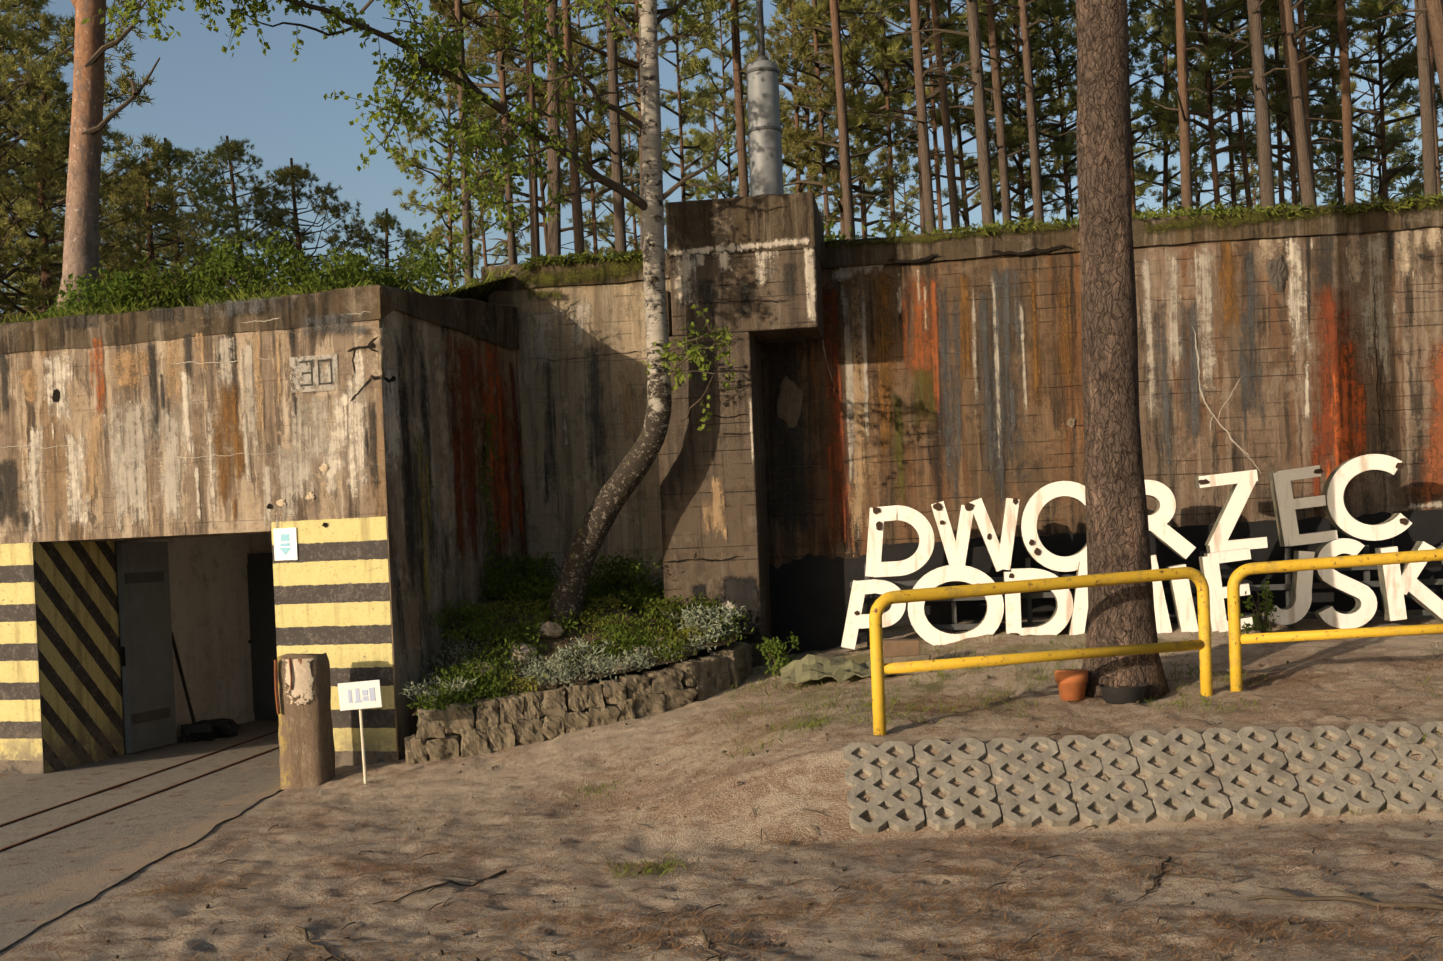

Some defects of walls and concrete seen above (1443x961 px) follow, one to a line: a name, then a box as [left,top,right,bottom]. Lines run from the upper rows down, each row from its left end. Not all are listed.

water stain [0,354,102,543]
water stain [148,297,453,587]
rust [448,335,521,556]
water stain [703,478,727,540]
water stain [671,238,816,320]
water stain [749,341,823,532]
rust [823,289,854,547]
water stain [832,265,1027,541]
water stain [1142,245,1216,467]
rust [1301,285,1367,516]
rust [1414,344,1443,510]